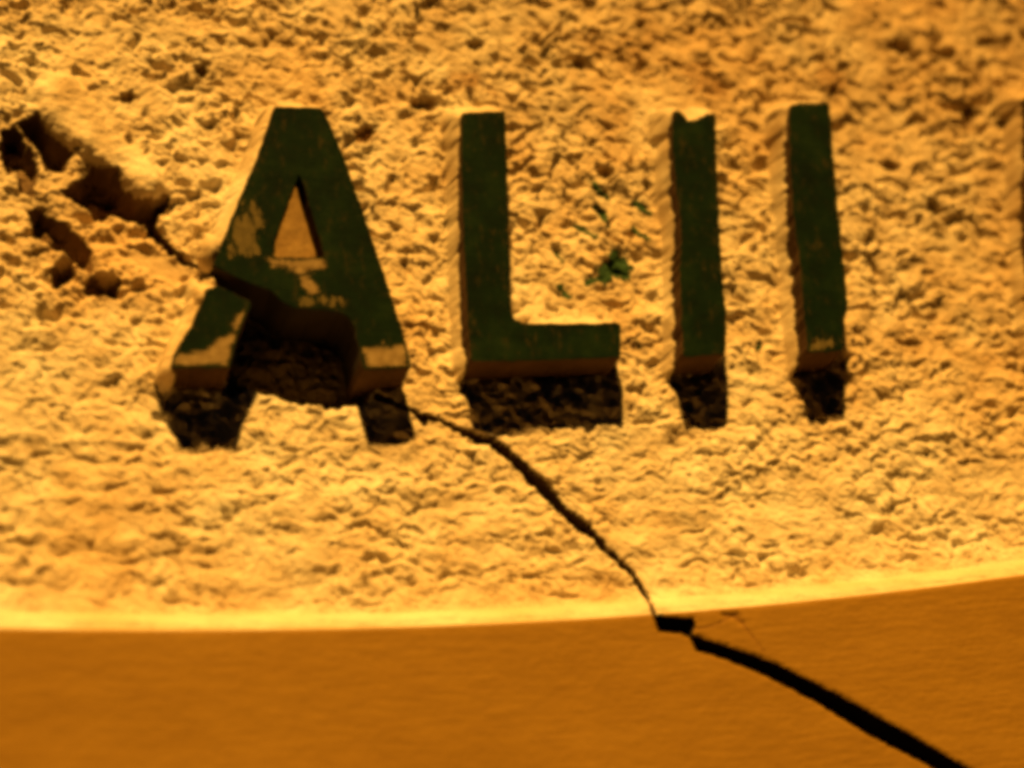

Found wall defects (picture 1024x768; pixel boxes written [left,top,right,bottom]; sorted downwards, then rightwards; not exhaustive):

crack [145,223,199,270]
spalling [0,108,408,411]
crack [373,392,968,768]